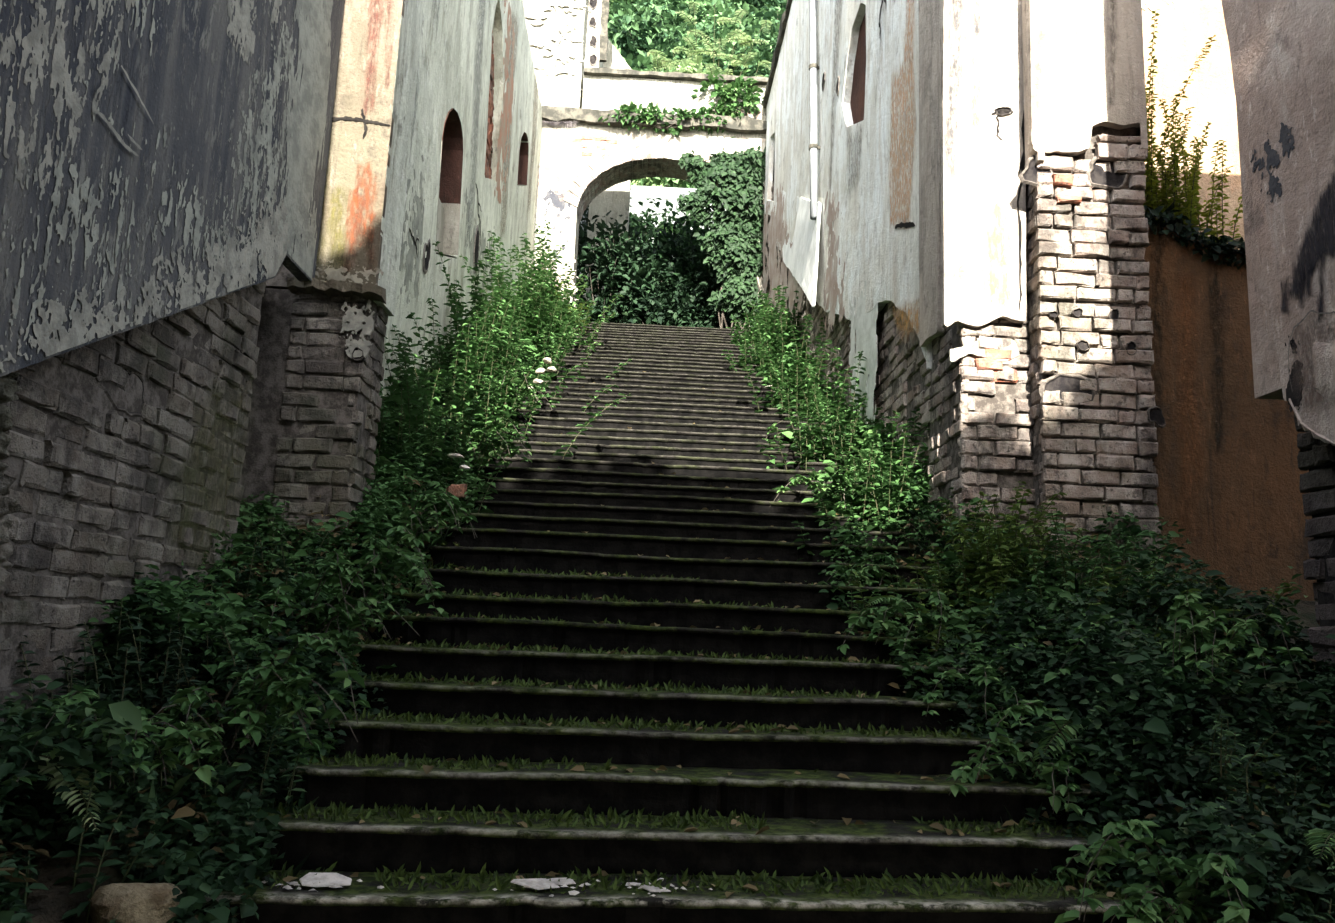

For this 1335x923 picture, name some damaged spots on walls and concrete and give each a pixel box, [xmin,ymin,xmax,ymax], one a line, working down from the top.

peeling [0,0,425,373]
flaking render [949,134,1166,582]
peeling [1141,0,1177,11]
peeling [1285,323,1335,445]